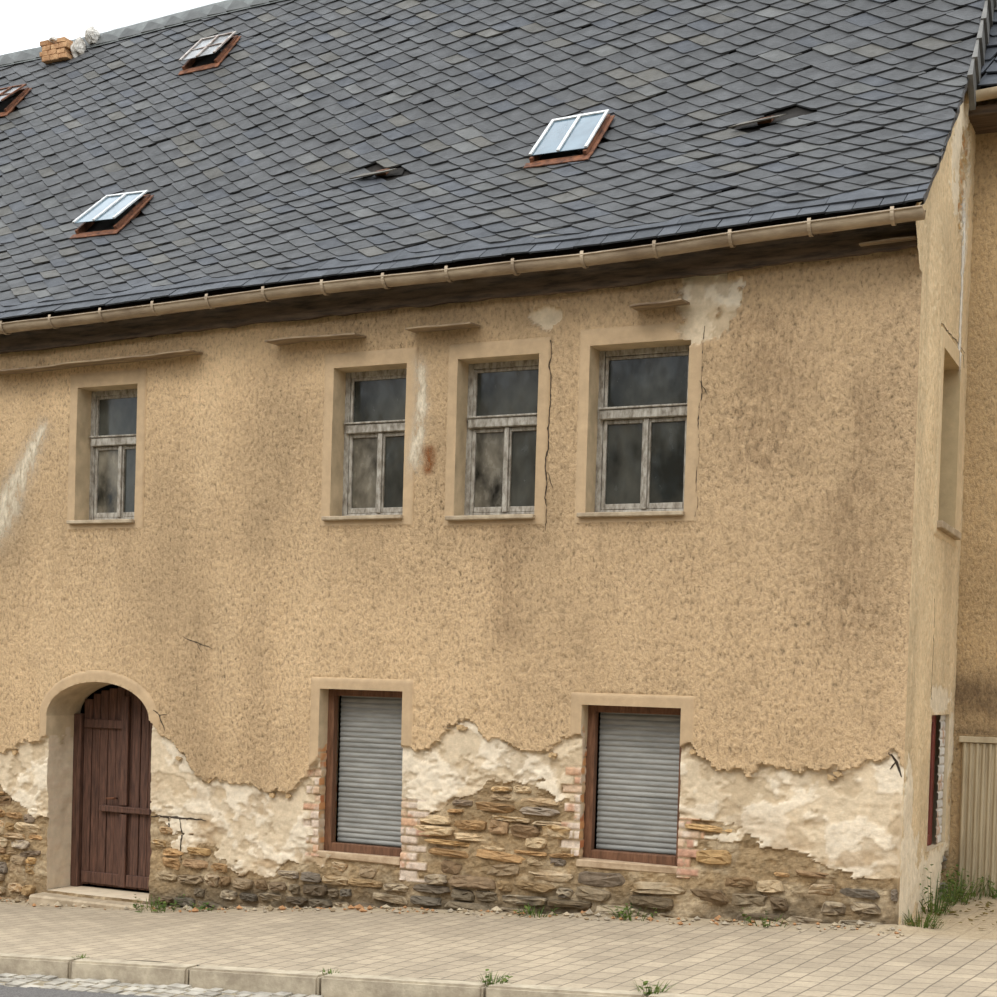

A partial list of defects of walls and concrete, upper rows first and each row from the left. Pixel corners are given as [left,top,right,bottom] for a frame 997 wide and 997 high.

flaking render [949,88,972,266]
flaking render [674,273,746,345]
water stain [0,425,46,536]
corrosion [425,447,433,472]
flaking render [0,718,950,925]